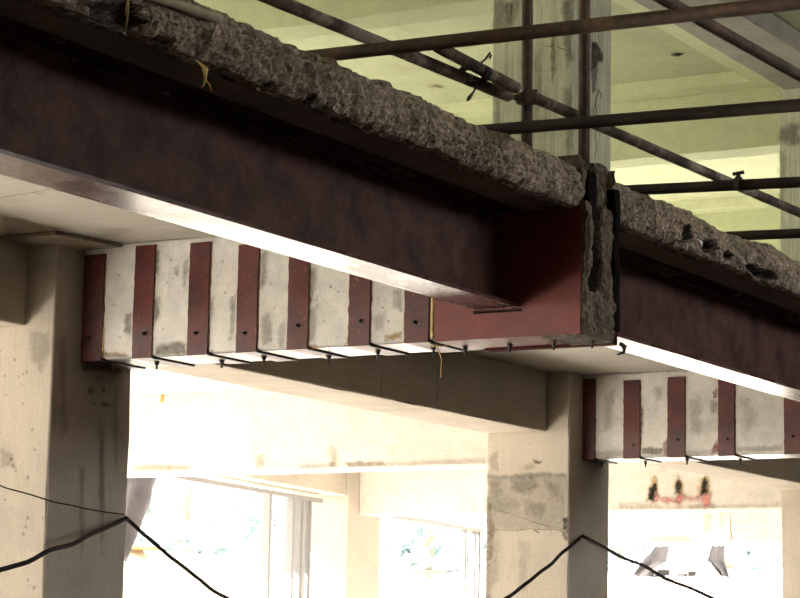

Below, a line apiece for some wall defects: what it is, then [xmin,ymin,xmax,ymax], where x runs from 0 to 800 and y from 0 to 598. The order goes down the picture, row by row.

spalling [612,182,800,301]